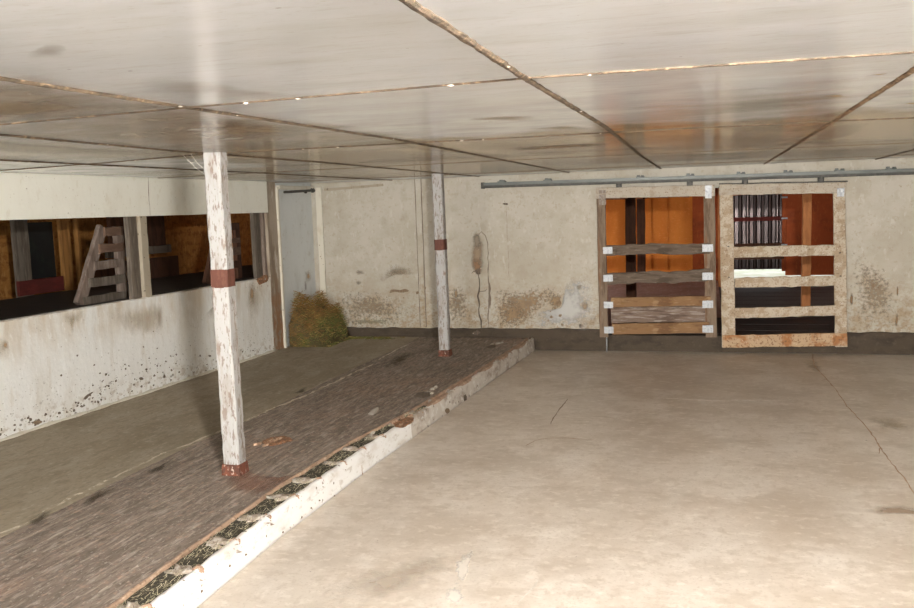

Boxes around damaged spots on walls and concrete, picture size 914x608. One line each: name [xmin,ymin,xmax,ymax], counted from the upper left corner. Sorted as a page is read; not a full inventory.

crack [812,353,914,493]